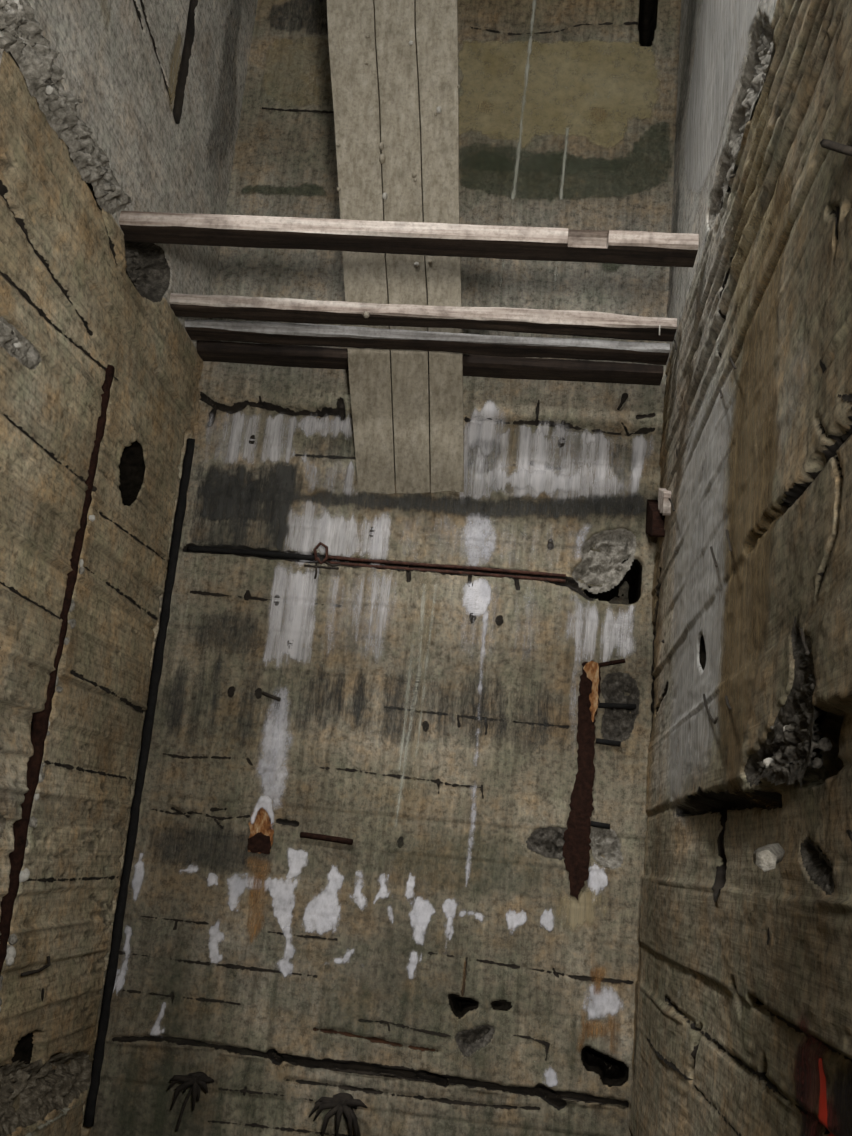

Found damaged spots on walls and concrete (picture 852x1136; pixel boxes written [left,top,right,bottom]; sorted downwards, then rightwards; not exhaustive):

crack [0,180,118,381]
crack [199,392,346,427]
crack [3,414,594,602]
leakage [190,401,647,743]
spalling [572,528,642,604]
rust [0,364,115,976]
leakage [132,668,393,977]
rust [557,659,636,930]
spalling [744,616,832,788]
leakage [406,875,483,978]
crack [112,1019,629,1136]
spalling [448,993,513,1057]